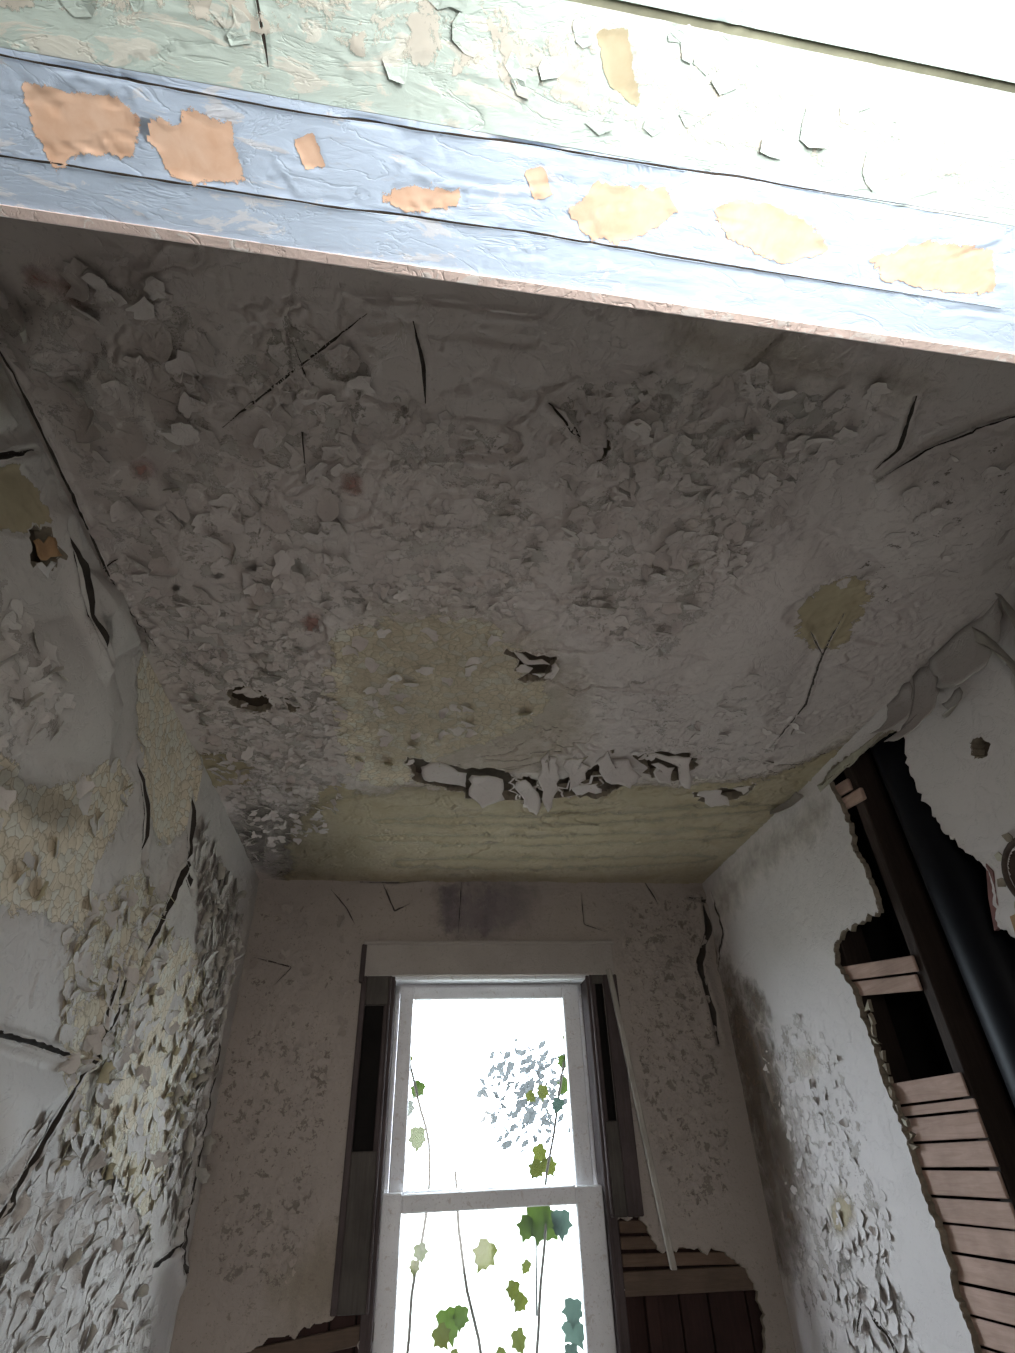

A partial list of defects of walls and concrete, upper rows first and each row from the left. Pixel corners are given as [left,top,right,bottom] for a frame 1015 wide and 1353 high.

crack [255,0,269,67]
crack [0,53,989,218]
peeling [188,0,978,191]
crack [0,154,1001,309]
crack [0,350,156,651]
flaking render [0,258,554,1353]
damp [234,740,849,884]
spalling [817,665,1015,1353]
spalling [618,1217,769,1353]
damp [715,949,798,1270]
peeling [762,1013,920,1353]
damp [831,1196,852,1231]